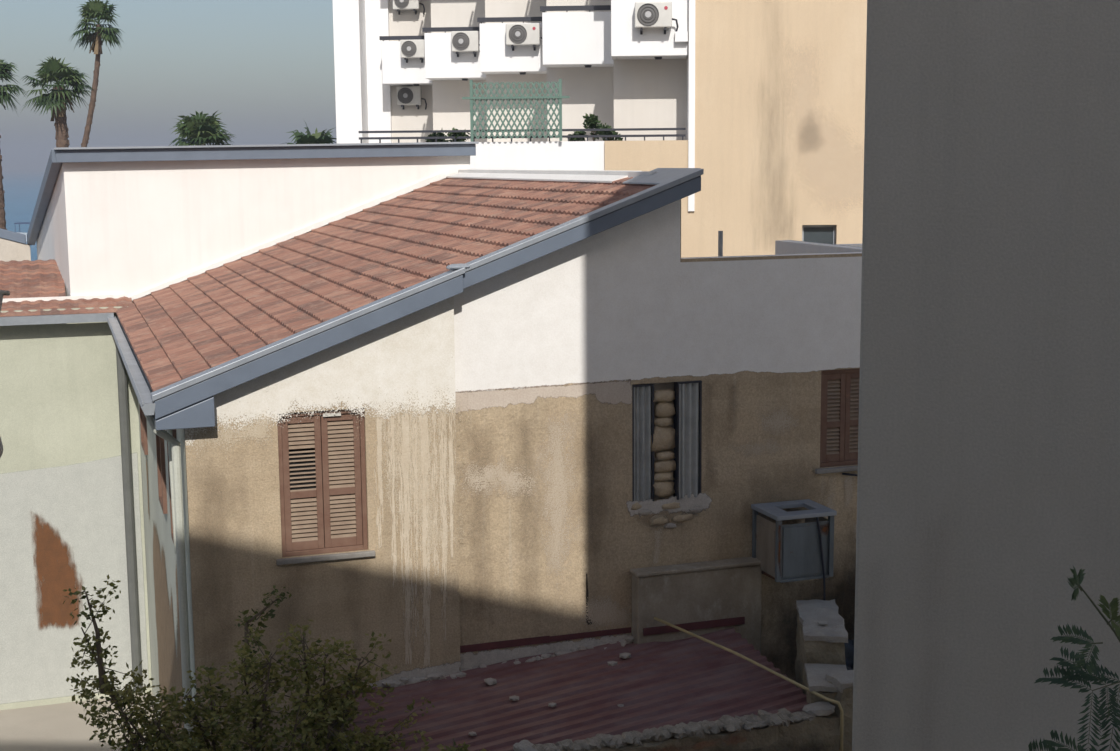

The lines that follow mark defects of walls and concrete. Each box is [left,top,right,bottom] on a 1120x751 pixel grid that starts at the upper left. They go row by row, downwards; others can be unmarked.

peeling [146,457,195,736]
water stain [354,385,586,668]
flaking render [626,389,712,528]